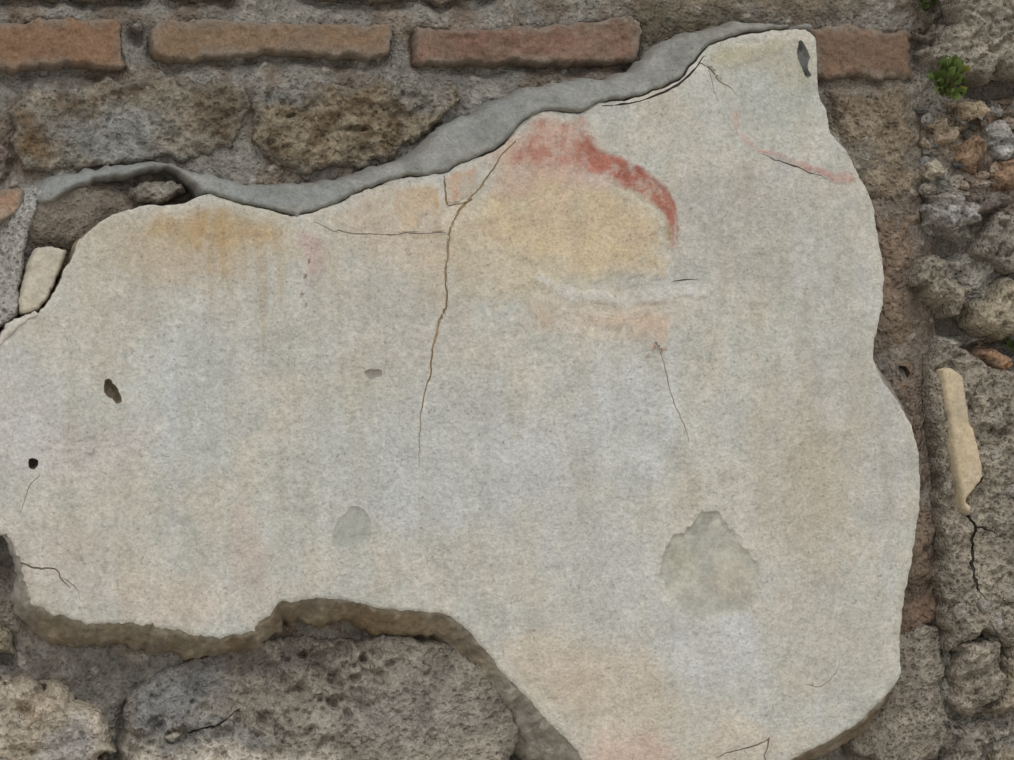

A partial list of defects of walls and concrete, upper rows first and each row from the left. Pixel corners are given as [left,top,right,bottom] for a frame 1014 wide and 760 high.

crack [763,154,827,179]
crack [314,141,516,466]
crack [656,344,689,442]
crack [19,562,80,600]
crack [966,515,998,599]
crack [716,738,770,760]